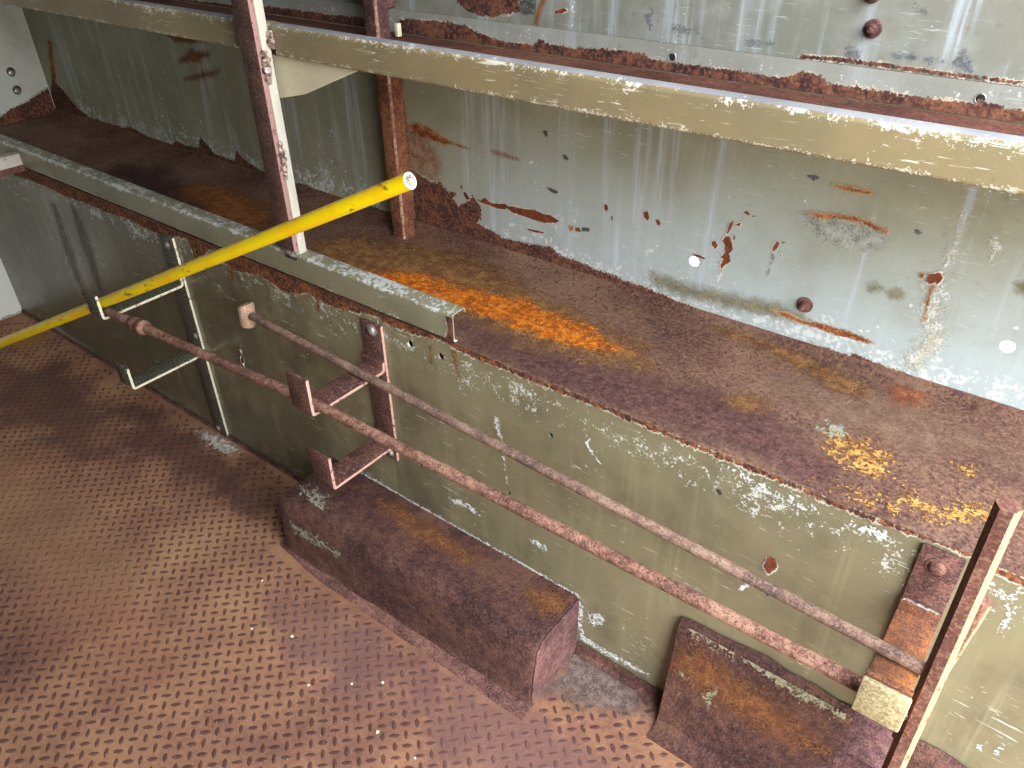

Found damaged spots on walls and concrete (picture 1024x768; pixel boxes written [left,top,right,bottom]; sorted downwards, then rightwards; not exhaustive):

corrosion [0,35,265,173]
corrosion [399,16,1024,123]
corrosion [14,169,220,259]
corrosion [407,122,698,308]
corrosion [829,181,875,196]
peeling [801,211,966,386]
corrosion [224,232,998,565]
corrosion [521,585,569,620]
peeling [762,557,779,575]
peeling [721,464,821,512]
peeling [847,520,889,544]
corrosion [994,567,1024,589]